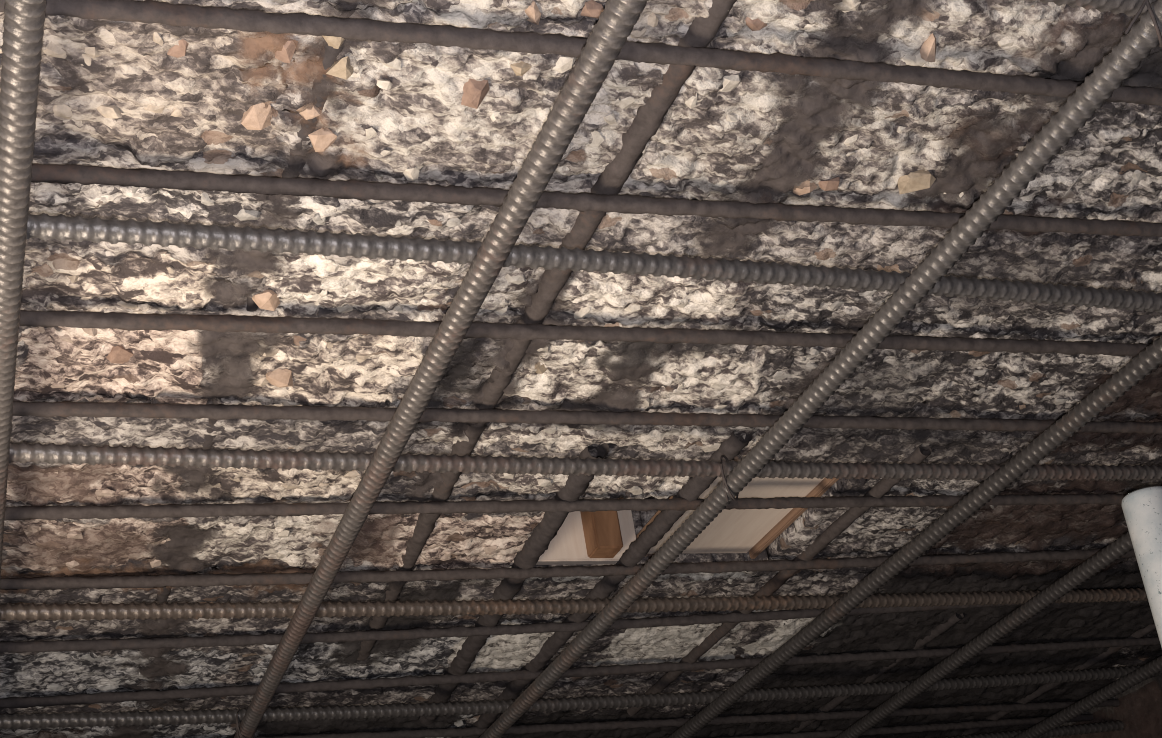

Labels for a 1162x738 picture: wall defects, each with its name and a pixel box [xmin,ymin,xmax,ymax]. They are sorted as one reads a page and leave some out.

leakage [320,0,370,19]
leakage [811,0,932,63]
leakage [723,73,881,204]
leakage [909,94,1049,208]
leakage [202,248,281,308]
leakage [188,330,281,400]
spalling [0,0,876,738]
leakage [551,347,678,428]
leakage [763,348,843,415]
spalling [503,0,1162,738]
leakage [148,466,238,575]
leakage [123,618,191,708]